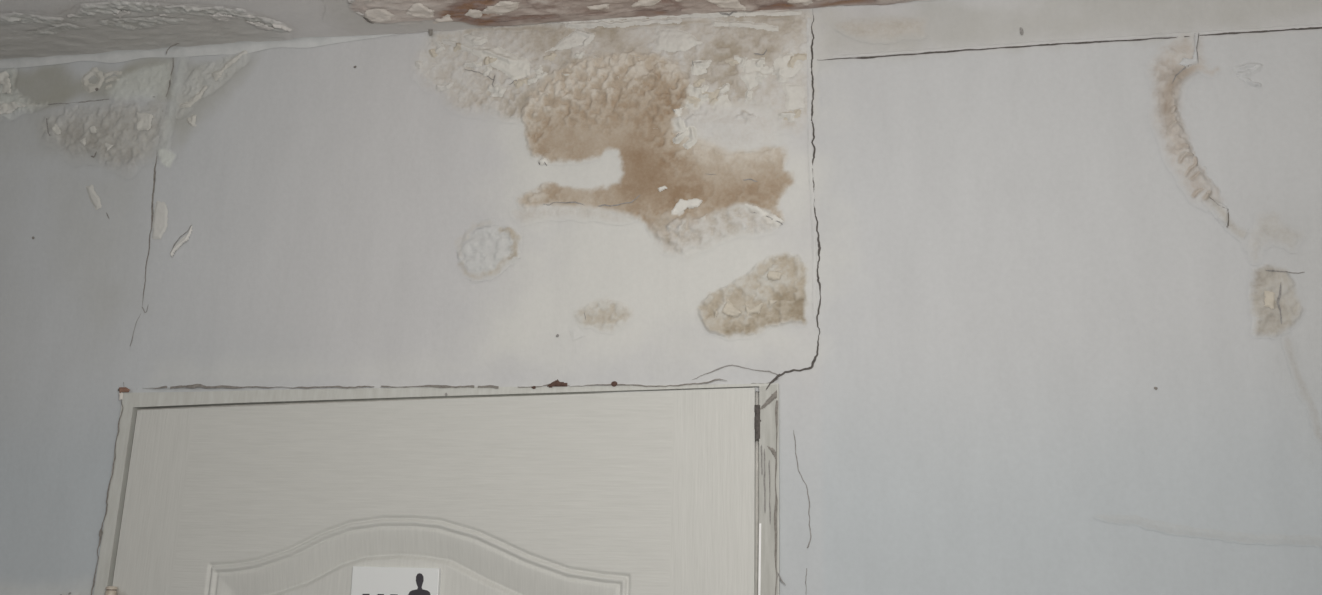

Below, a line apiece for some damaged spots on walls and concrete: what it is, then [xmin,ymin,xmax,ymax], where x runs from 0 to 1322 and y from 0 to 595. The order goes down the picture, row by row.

flaking render [0,0,297,123]
crack [130,43,190,346]
flaking render [322,0,932,138]
water stain [509,49,797,262]
peeling [1144,31,1250,242]
water stain [556,294,636,341]
water stain [694,250,810,342]
crack [518,15,1322,595]
crack [142,384,499,396]